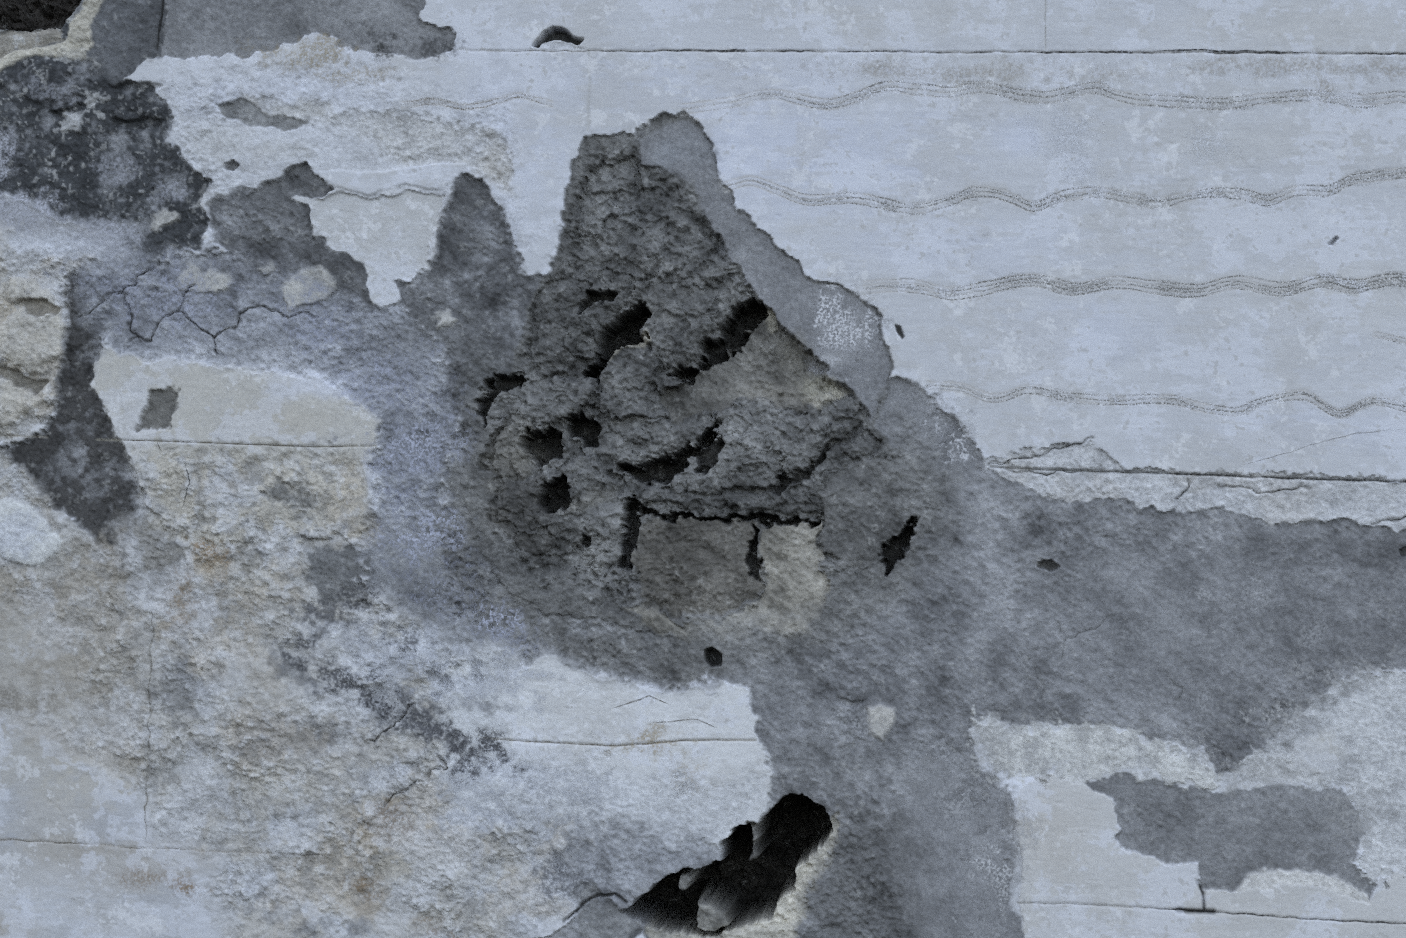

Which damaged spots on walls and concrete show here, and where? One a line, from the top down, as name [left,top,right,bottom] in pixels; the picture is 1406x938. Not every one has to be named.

crack [76,238,461,615]
flaking render [0,0,622,938]
peeling [292,111,1406,938]